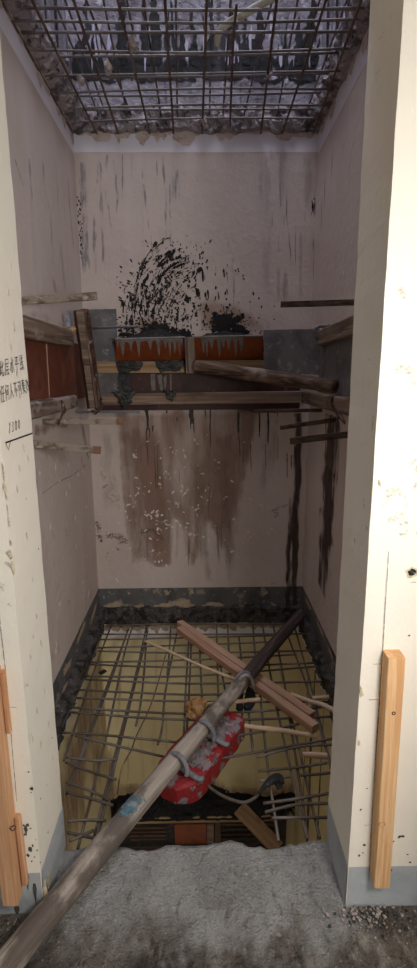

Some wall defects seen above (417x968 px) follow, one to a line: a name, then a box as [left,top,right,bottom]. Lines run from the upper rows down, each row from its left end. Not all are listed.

spalling [0,0,370,146]
water stain [95,410,278,566]
water stain [271,413,302,606]
water stain [318,413,340,596]